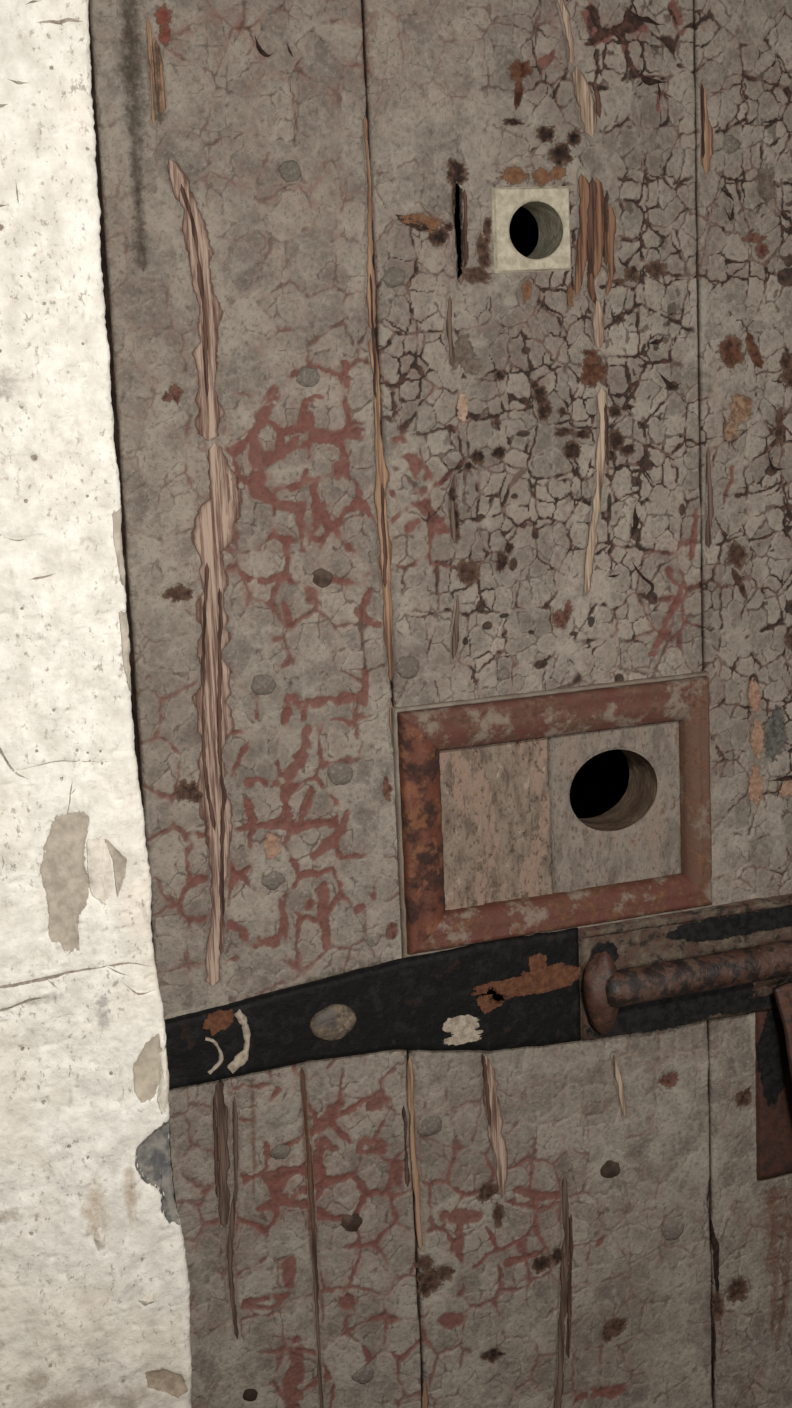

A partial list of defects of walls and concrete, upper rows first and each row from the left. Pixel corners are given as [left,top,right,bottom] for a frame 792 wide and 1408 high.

crack [624,0,664,25]
crack [636,71,665,101]
crack [721,188,734,221]
crack [648,337,679,389]
crack [768,453,783,471]
crack [609,466,654,597]
crack [771,775,792,797]
flaking render [40,811,127,954]
corrosion [472,953,581,1015]
peeling [205,1009,251,1075]
flaking render [133,1034,180,1225]